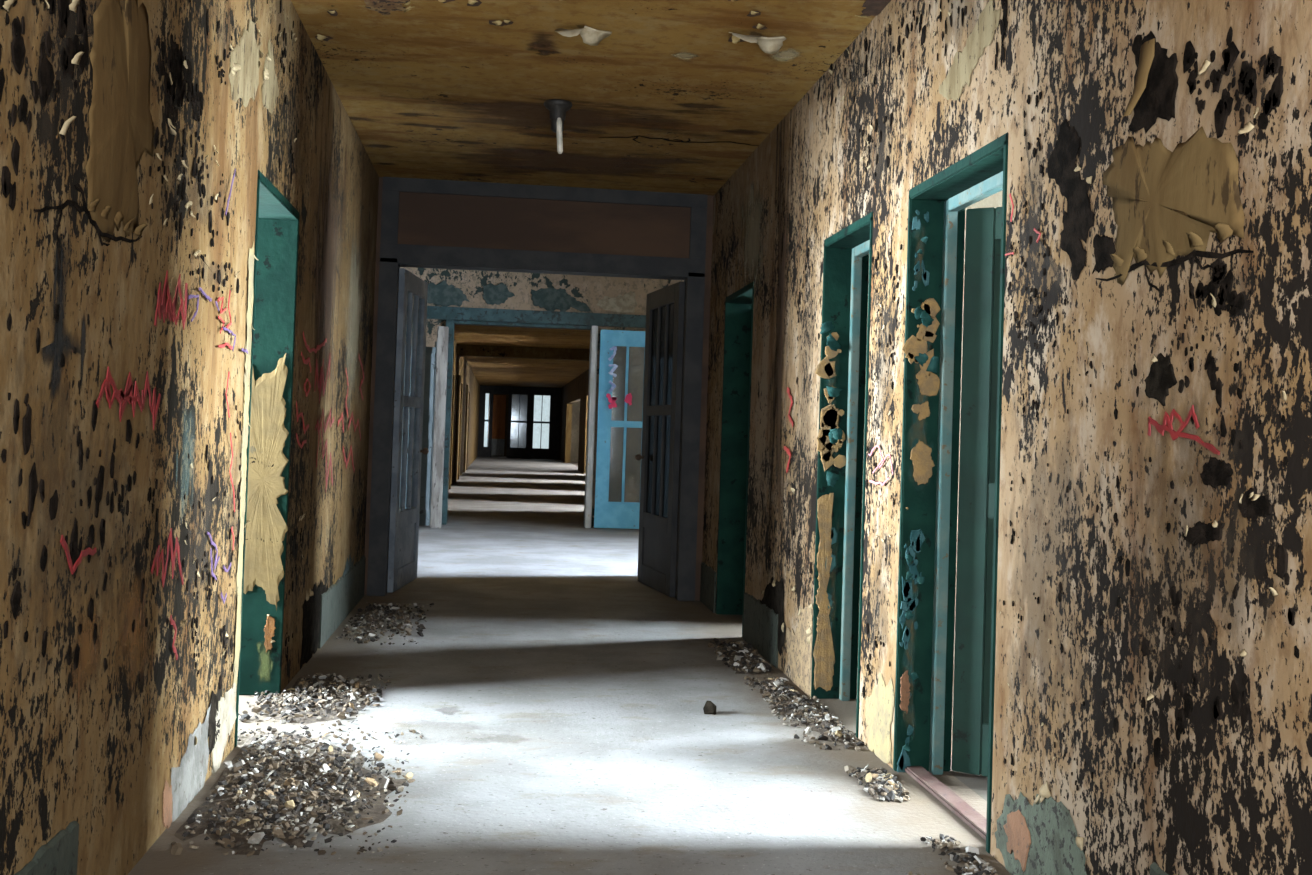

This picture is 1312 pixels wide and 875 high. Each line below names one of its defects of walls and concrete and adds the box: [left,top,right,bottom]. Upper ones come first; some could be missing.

peeling [555,26,612,46]
peeling [728,11,799,61]
peeling [868,210,941,421]
peeling [4,393,159,670]
peeling [149,34,354,829]
peeling [760,321,846,697]
peeling [910,440,935,485]
peeling [1007,354,1038,417]
peeling [1264,545,1290,596]
peeling [1149,662,1198,768]
peeling [1213,673,1250,729]
spalling [994,780,1087,875]